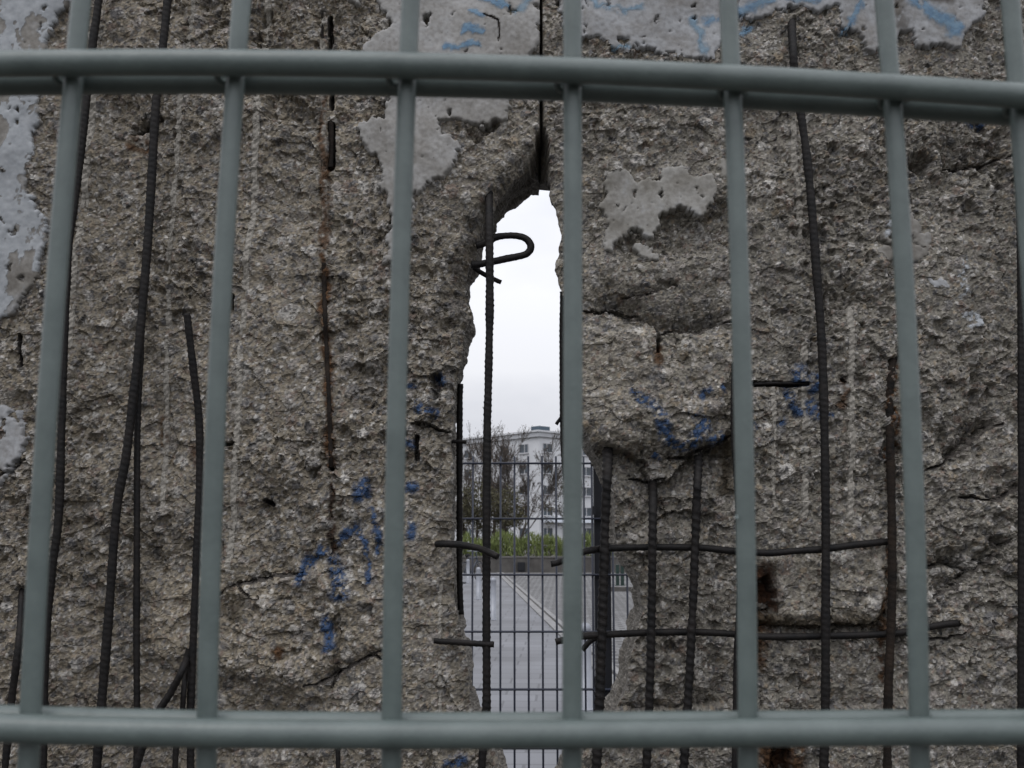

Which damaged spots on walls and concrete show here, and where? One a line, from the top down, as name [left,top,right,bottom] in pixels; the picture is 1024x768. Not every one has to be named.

peeling [0,96,51,319]
peeling [412,97,512,224]
corrosion [317,96,335,467]
crack [625,289,667,299]
crack [659,321,731,336]
spalling [96,94,161,709]
spalling [413,184,535,712]
spalling [754,112,907,710]
crack [220,571,301,598]
corrosion [326,483,338,563]
crack [303,649,382,688]
corrosion [756,563,778,667]